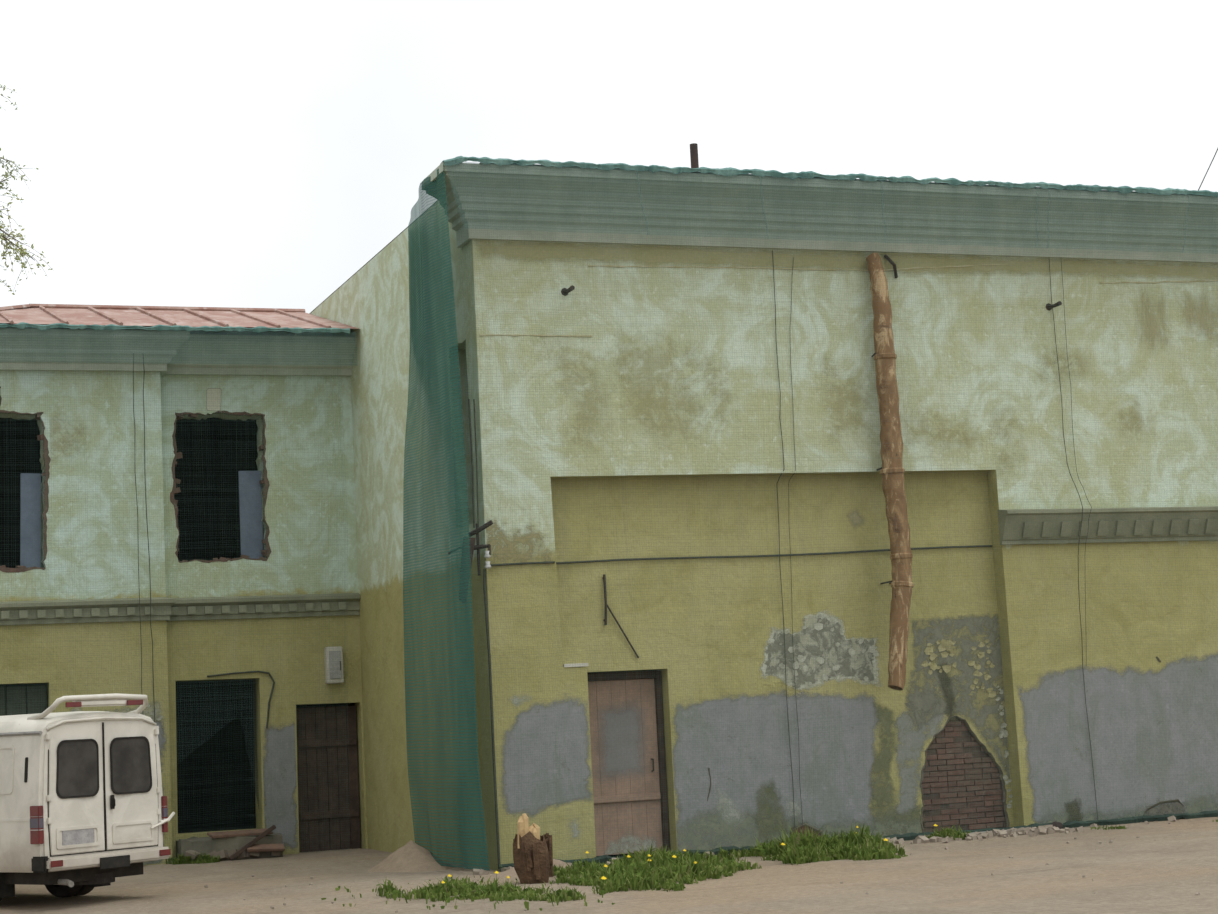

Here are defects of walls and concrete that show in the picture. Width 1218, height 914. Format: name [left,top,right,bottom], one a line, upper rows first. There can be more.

peeling [761,611,879,690]
peeling [106,702,163,722]
flaking render [920,715,1010,833]
flaking render [1144,799,1184,818]